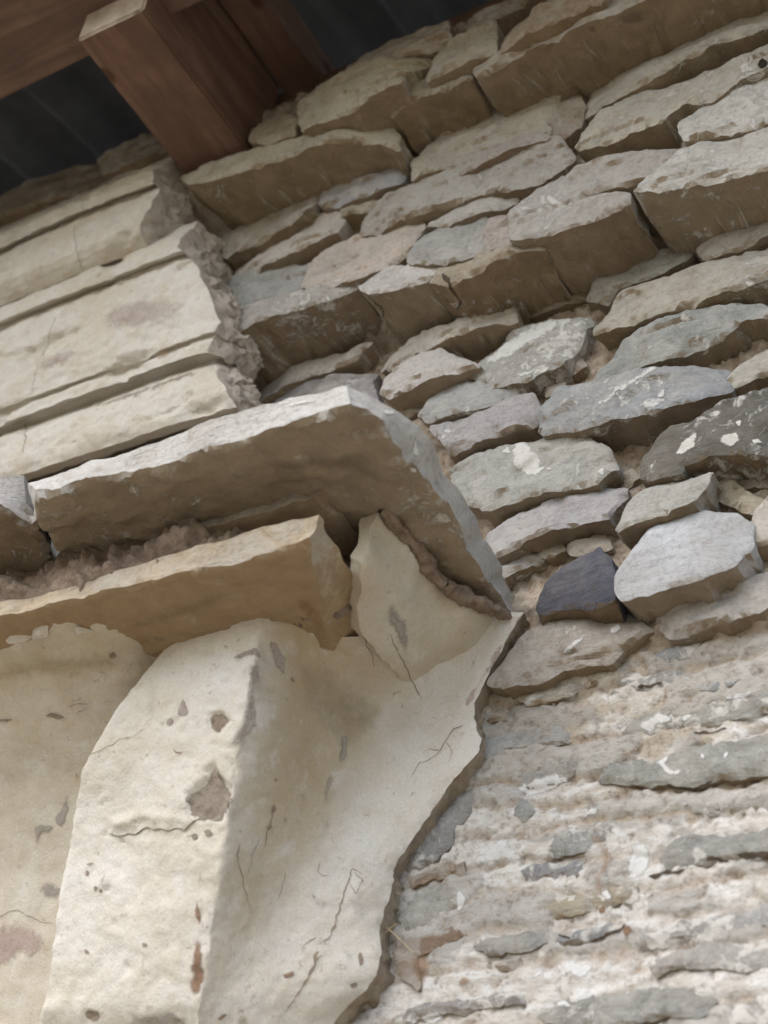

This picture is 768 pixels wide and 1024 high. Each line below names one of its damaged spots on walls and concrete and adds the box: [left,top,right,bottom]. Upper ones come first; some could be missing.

crack [363,634,421,697]
crack [411,725,463,776]
flaking render [186,770,233,839]
crack [287,861,363,1009]